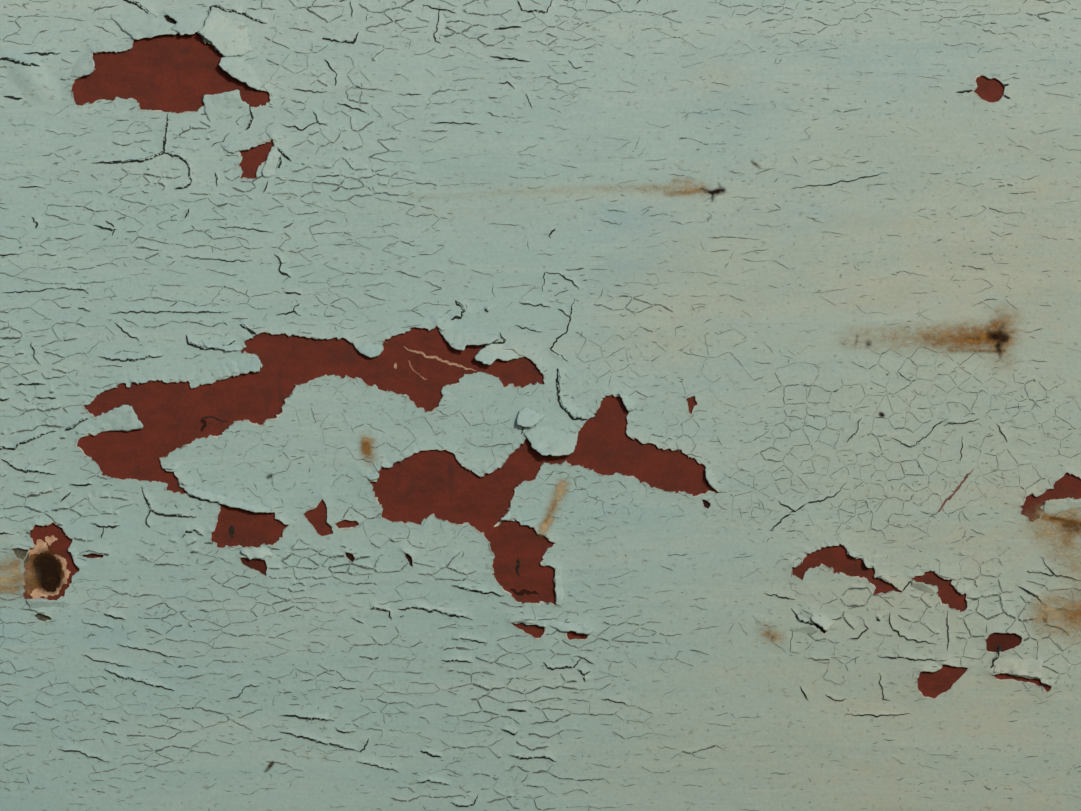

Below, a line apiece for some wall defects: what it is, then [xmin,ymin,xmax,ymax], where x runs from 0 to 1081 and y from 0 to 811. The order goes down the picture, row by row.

peeling [70,5,271,123]
rust [893,315,1013,353]
peeling [75,324,546,578]
peeling [361,392,721,607]
peeling [1019,472,1081,522]
rust [0,535,71,600]
peeling [792,544,968,613]
crack [0,492,728,811]
peeling [917,664,970,699]
crack [707,706,789,757]
crack [825,694,960,769]
crack [918,768,1035,802]